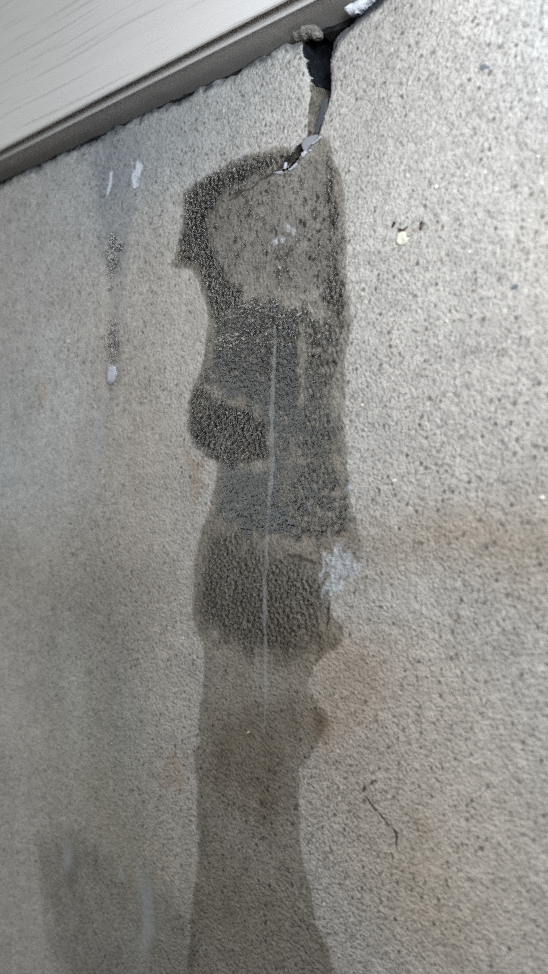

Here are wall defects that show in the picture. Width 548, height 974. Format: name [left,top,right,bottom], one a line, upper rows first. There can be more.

crack [229,21,354,200]
efflorescence [324,548,357,591]